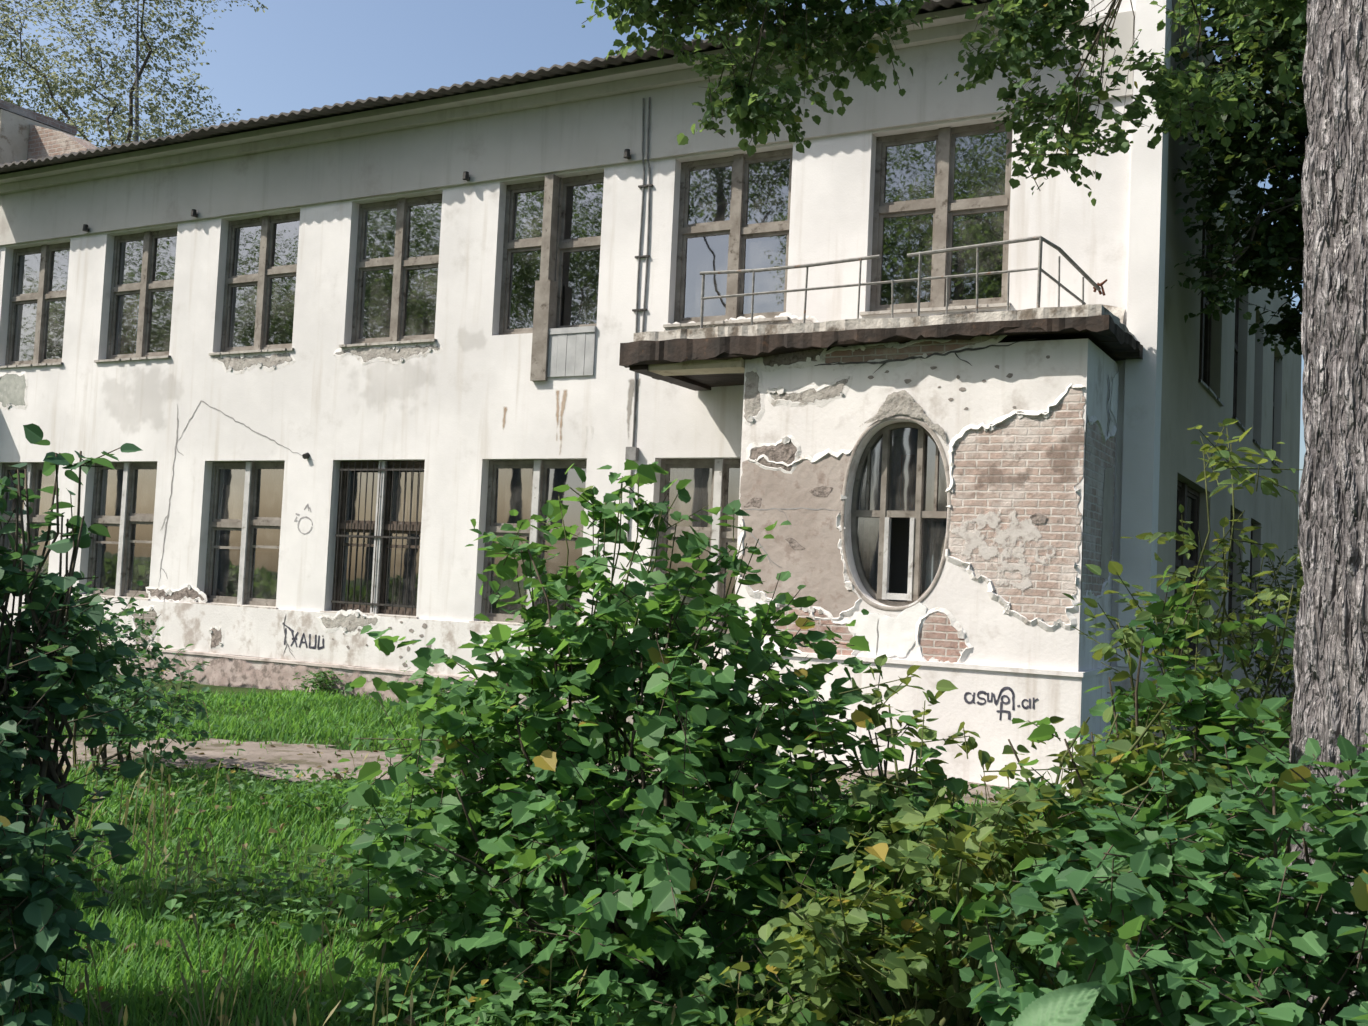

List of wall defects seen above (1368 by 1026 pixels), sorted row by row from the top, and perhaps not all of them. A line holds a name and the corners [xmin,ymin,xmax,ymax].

spalling [210,349,296,375]
spalling [333,341,443,365]
rust [556,391,567,440]
crack [159,400,313,580]
flaking render [738,335,1119,664]
spalling [130,584,431,702]